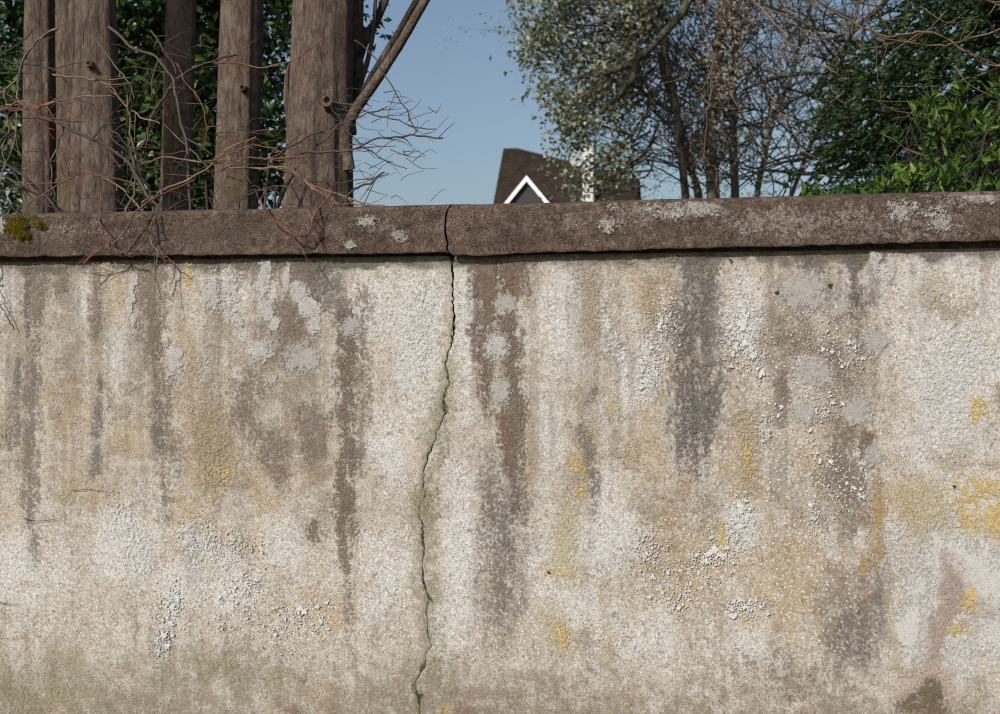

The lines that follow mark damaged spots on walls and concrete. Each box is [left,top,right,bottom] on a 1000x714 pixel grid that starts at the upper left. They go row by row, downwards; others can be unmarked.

damp [3,263,68,571]
damp [86,262,105,341]
damp [87,374,104,480]
damp [128,261,185,520]
damp [215,259,378,645]
crack [412,239,456,714]
damp [661,253,731,496]
damp [766,251,874,428]
damp [814,413,876,539]
damp [727,546,894,706]